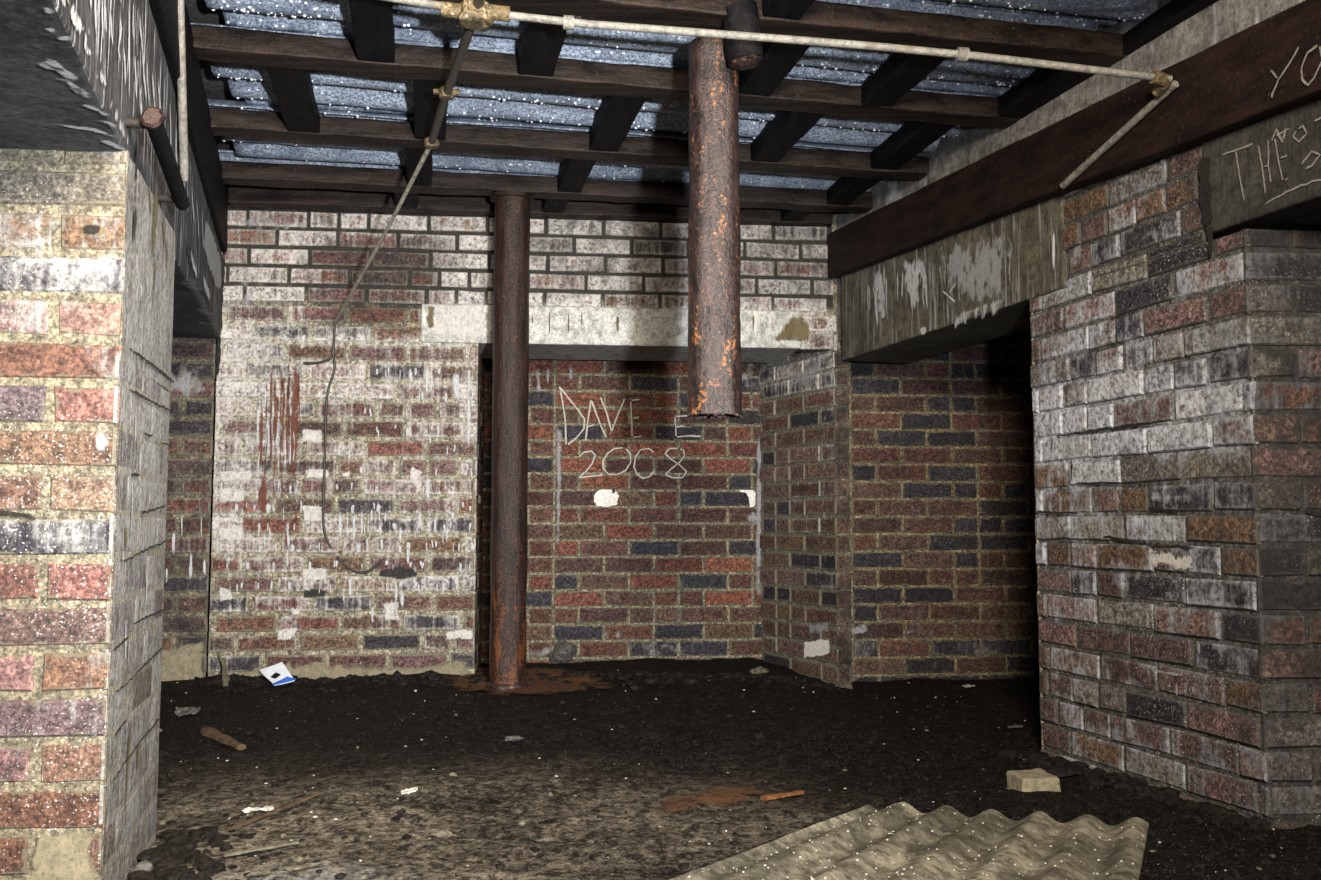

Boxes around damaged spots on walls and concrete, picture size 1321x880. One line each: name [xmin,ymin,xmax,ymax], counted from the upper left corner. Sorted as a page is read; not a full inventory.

spalling [955,300,1002,327]